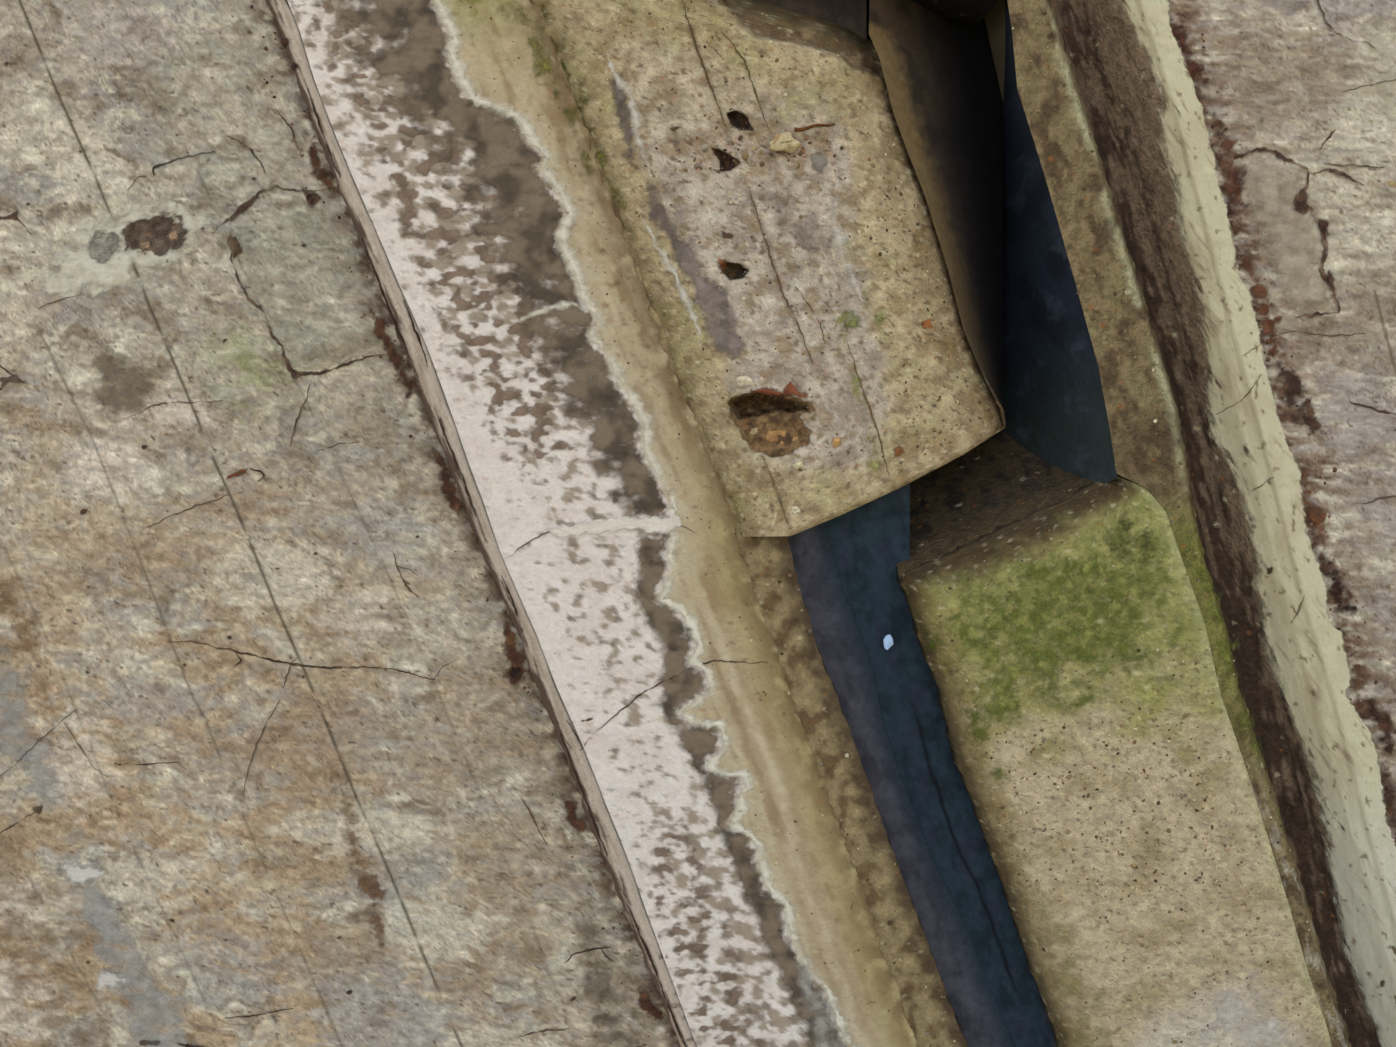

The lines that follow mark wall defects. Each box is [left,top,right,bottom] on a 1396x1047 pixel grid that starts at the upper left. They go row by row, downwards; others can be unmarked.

corrosion [1174,12,1210,83]
crack [1324,161,1384,169]
spalling [88,212,204,263]
corrosion [1210,114,1321,434]
spalling [729,376,814,469]
leakage [307,0,855,1047]
crack [172,640,448,796]